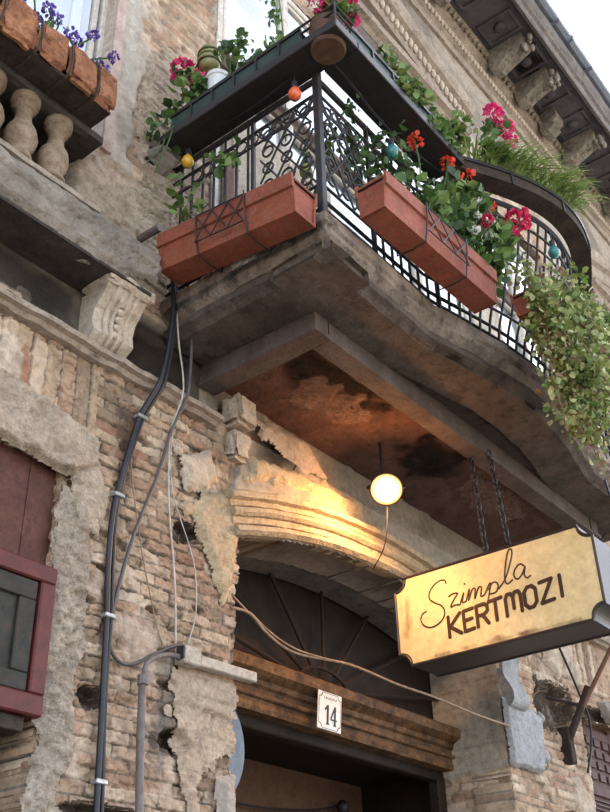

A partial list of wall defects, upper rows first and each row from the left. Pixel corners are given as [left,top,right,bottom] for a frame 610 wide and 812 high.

water stain [285,351,390,412]
water stain [262,445,292,468]
water stain [401,434,467,479]
flaking render [172,445,239,607]
spalling [147,704,177,758]
peeling [501,645,610,774]